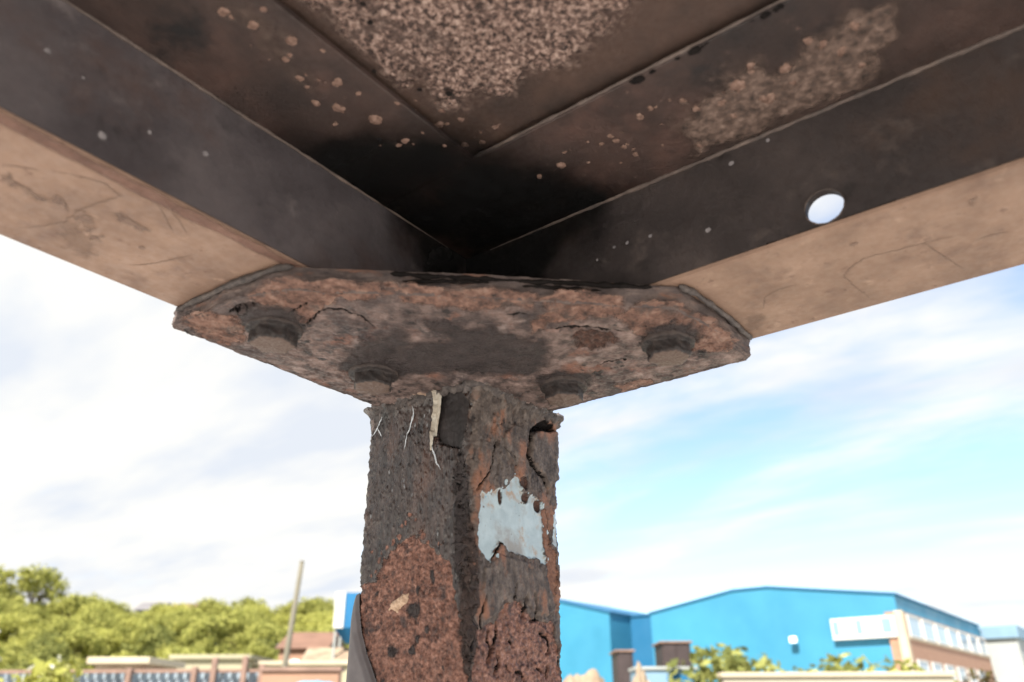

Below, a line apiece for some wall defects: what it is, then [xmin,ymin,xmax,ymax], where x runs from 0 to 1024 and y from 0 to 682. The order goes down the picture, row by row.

spalling [303,0,631,112]
rust [295,73,345,126]
rust [0,112,739,352]
damp [302,131,618,278]
crack [293,302,373,326]
peeling [429,390,442,451]
damp [339,319,592,387]
crack [476,420,553,490]
rust [615,378,653,392]
peeling [477,473,557,565]
rust [540,509,559,595]
spalling [346,513,561,682]